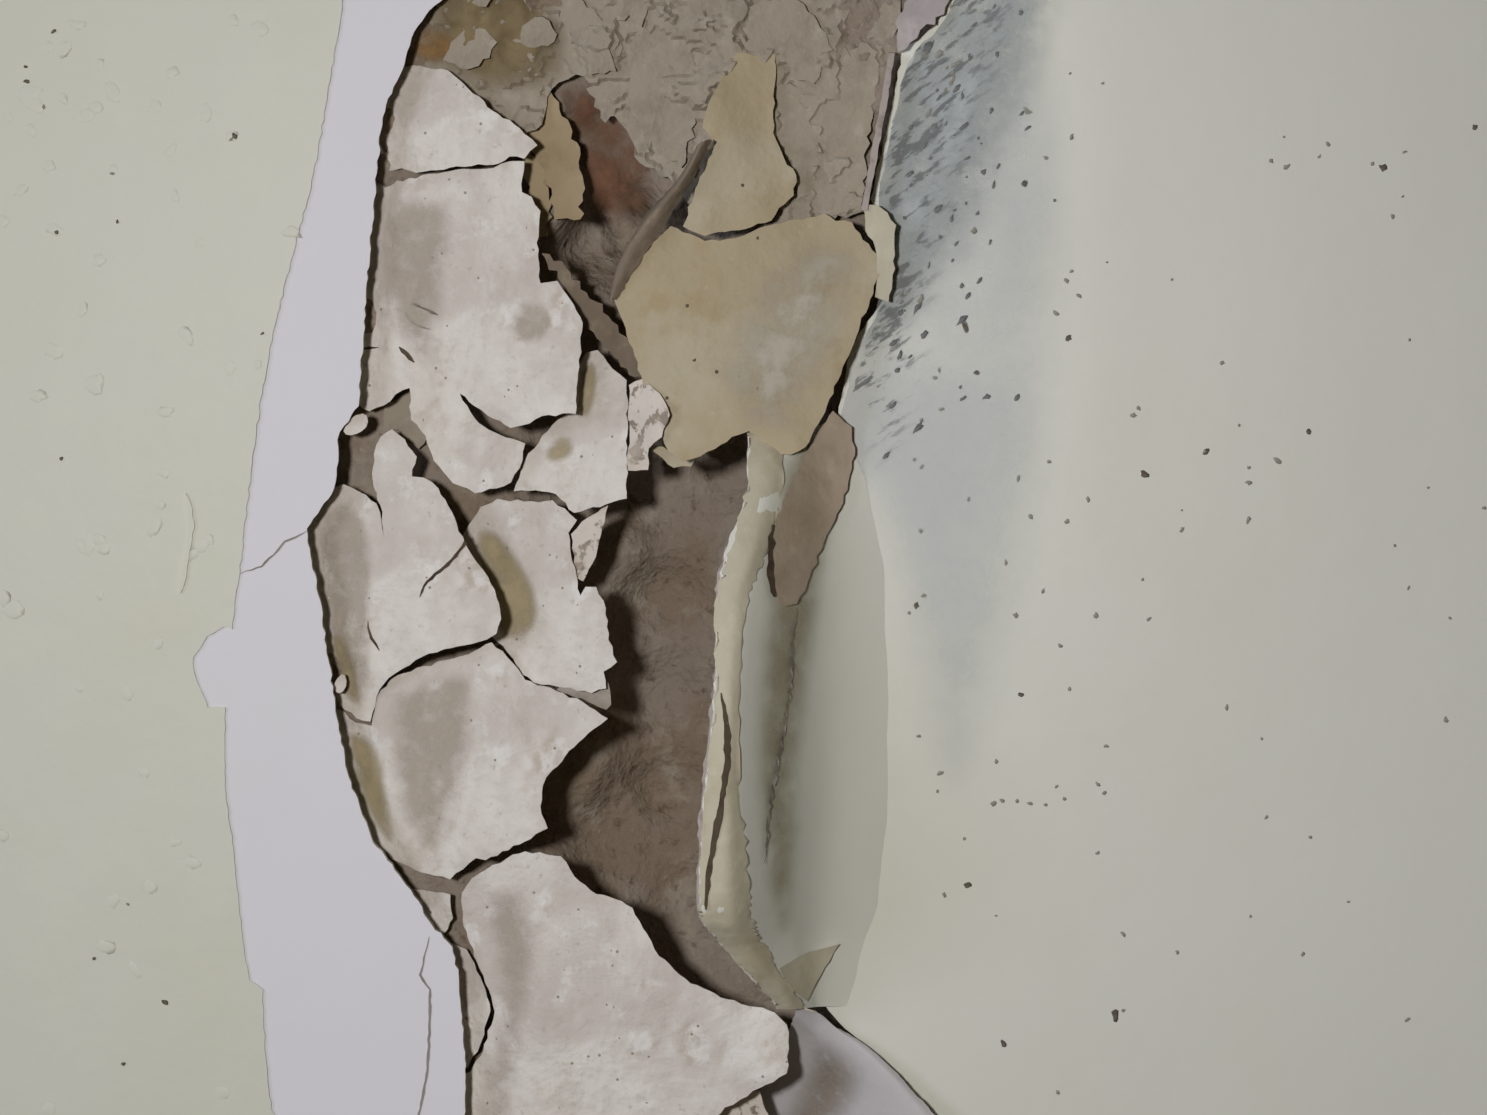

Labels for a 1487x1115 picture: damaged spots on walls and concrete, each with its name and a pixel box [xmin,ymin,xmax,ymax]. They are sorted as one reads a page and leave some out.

crack [417,938,432,1115]
flaking render [193,0,949,1115]
leakage [852,0,1027,564]
peeling [990,785,1066,807]